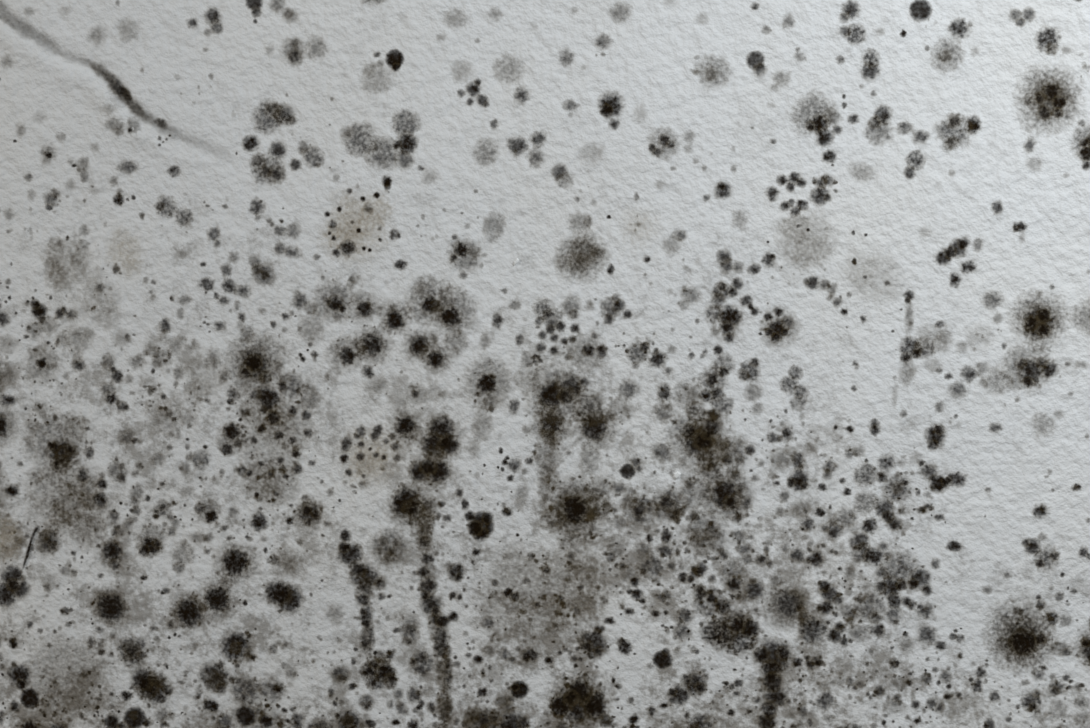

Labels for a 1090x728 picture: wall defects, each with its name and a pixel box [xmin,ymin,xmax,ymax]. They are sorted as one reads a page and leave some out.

leakage [910,0,930,19]
leakage [375,50,404,71]
crack [110,76,131,101]
leakage [600,95,621,129]
leakage [236,104,321,182]
leakage [768,95,857,231]
leakage [937,239,975,285]
leakage [1025,301,1059,338]
leakage [154,344,319,575]
leakage [69,458,164,568]
leakage [0,560,28,605]
leakage [168,587,247,639]